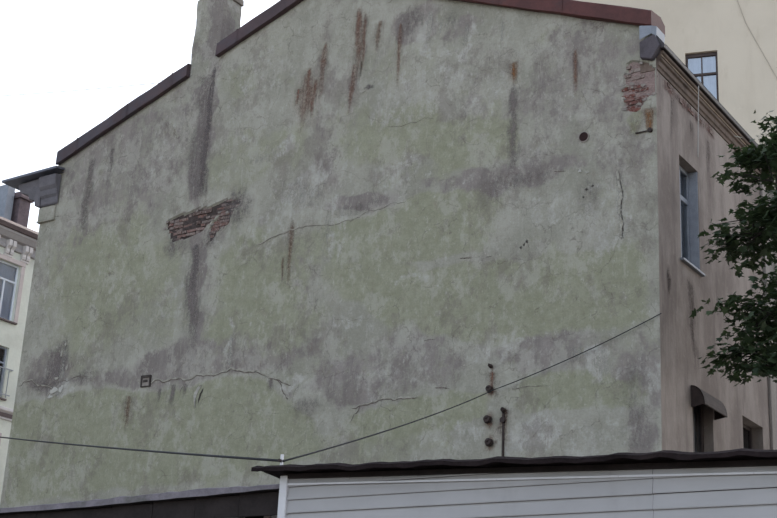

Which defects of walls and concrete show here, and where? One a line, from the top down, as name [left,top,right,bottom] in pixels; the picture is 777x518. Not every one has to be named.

spalling [621,61,658,112]
damp [189,70,216,197]
spalling [163,192,246,252]
crack [257,199,408,245]
damp [186,245,199,333]
crack [151,367,291,399]
crack [351,396,418,421]